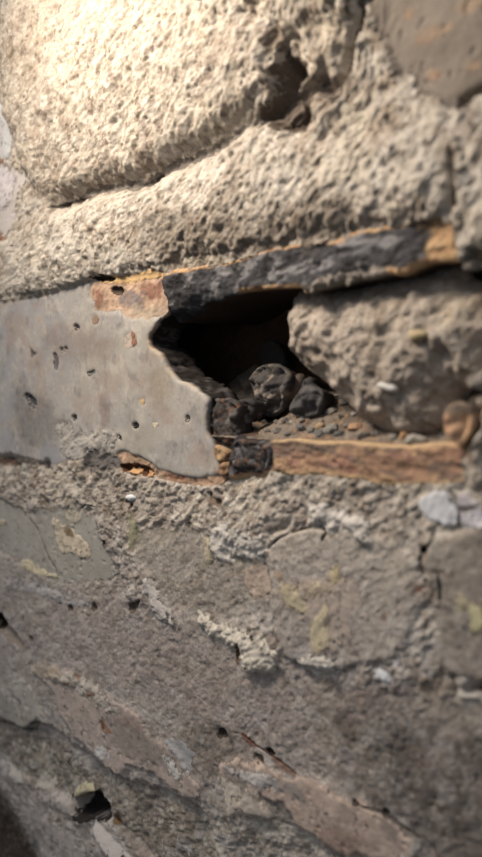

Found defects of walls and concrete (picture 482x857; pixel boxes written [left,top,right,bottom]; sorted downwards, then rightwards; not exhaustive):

crack [344,0,366,74]
peeling [0,99,27,237]
spalling [90,268,168,324]
spalling [124,331,137,349]
spalling [443,401,482,447]
peeling [0,768,99,857]
flaking render [217,753,421,857]